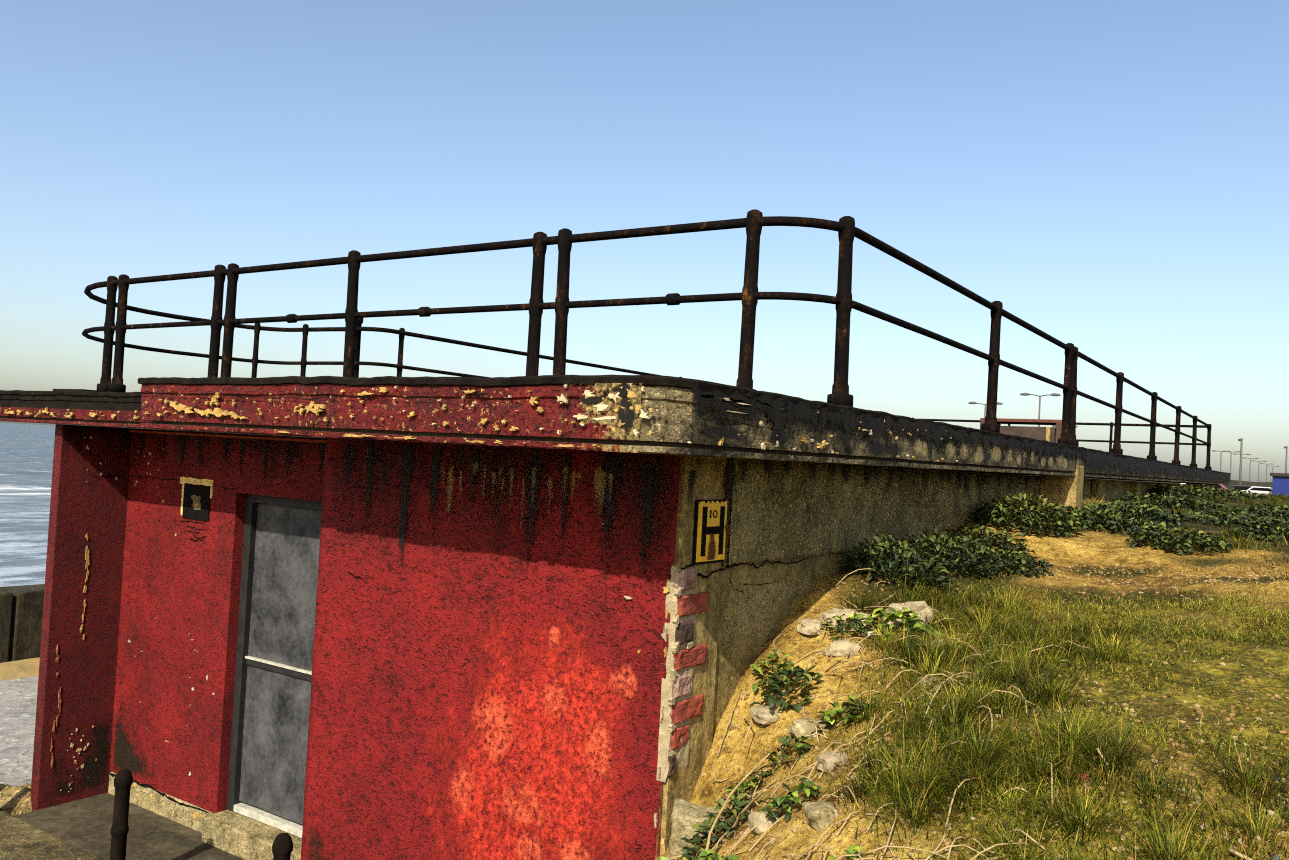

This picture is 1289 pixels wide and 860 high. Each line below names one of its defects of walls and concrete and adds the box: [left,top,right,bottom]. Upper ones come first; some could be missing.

peeling [0,408,73,419]
peeling [89,386,417,440]
water stain [343,440,580,562]
peeling [432,383,664,453]
water stain [596,452,673,566]
peeling [761,435,839,454]
water stain [692,385,1230,525]
peeling [80,534,90,640]
crack [681,558,810,593]
peeling [50,645,97,792]
flaking render [656,565,709,782]